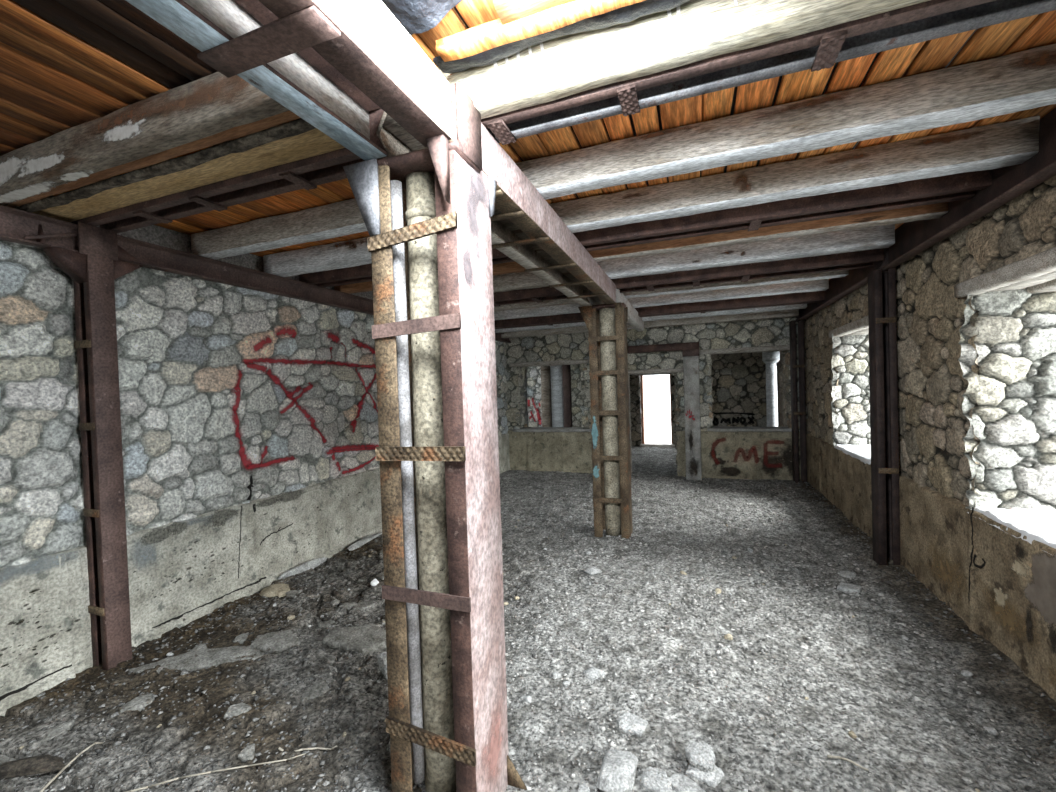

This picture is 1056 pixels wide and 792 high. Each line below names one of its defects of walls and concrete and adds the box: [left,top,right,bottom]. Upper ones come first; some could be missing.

crack [152,475,293,628]
crack [968,507,986,600]
crack [0,664,72,701]
leakage [1048,626,1056,653]